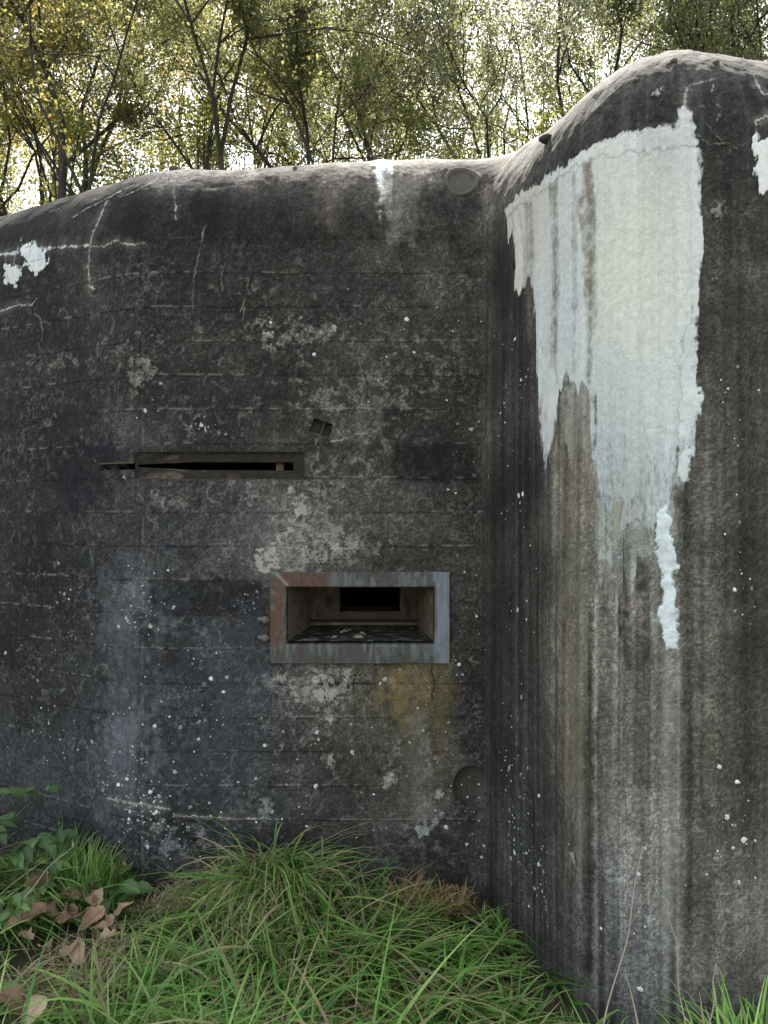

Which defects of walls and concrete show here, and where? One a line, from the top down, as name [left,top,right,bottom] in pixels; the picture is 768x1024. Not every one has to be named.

crack [0,169,177,290]
crack [191,225,250,331]
leakage [372,159,418,246]
leakage [505,105,704,669]